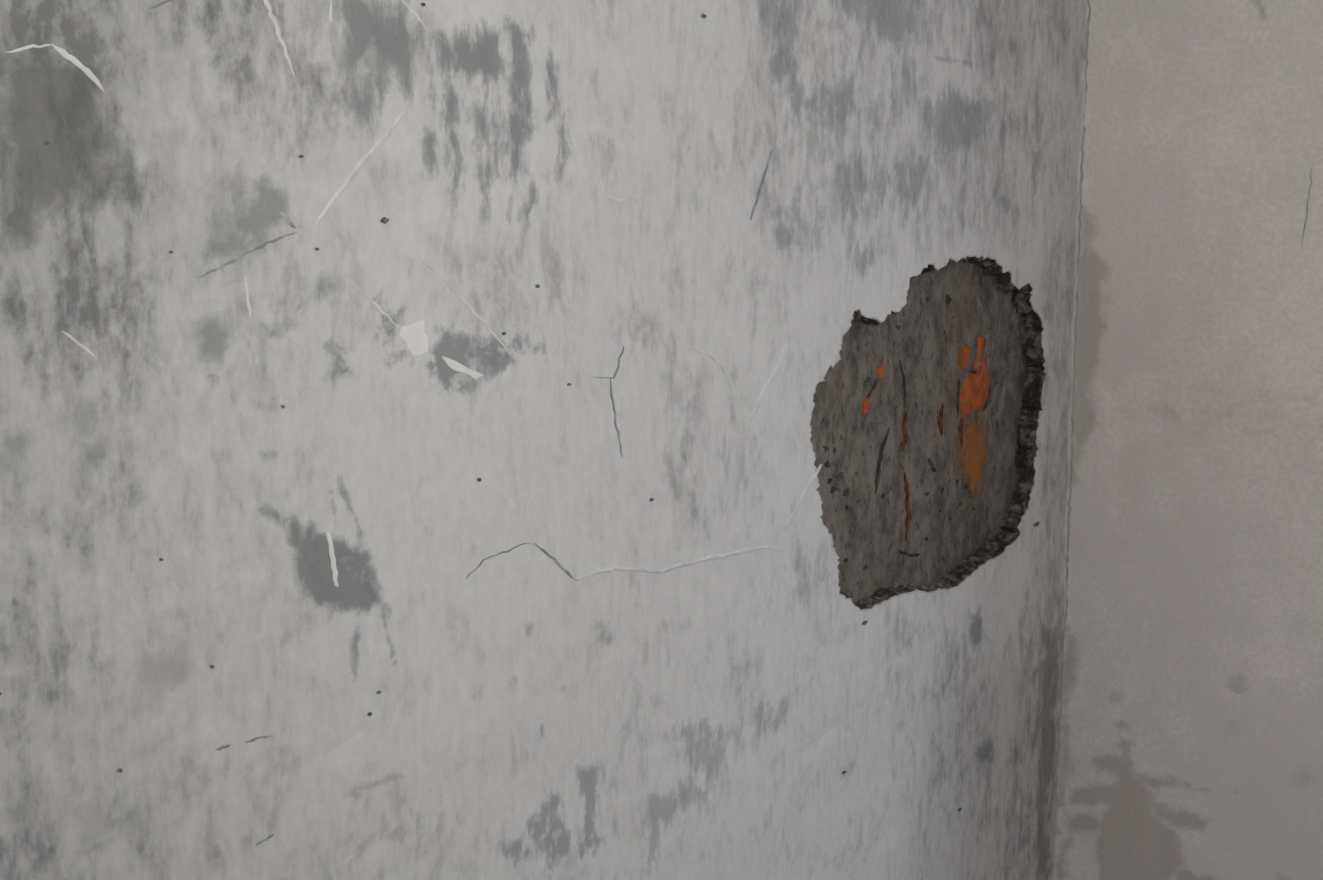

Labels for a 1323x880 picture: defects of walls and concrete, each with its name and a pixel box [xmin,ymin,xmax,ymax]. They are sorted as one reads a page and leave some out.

flaking render [757,0,1050,667]
crack [594,346,624,457]
crack [465,543,577,581]
peeling [968,721,1001,788]
water stain [1026,600,1252,880]